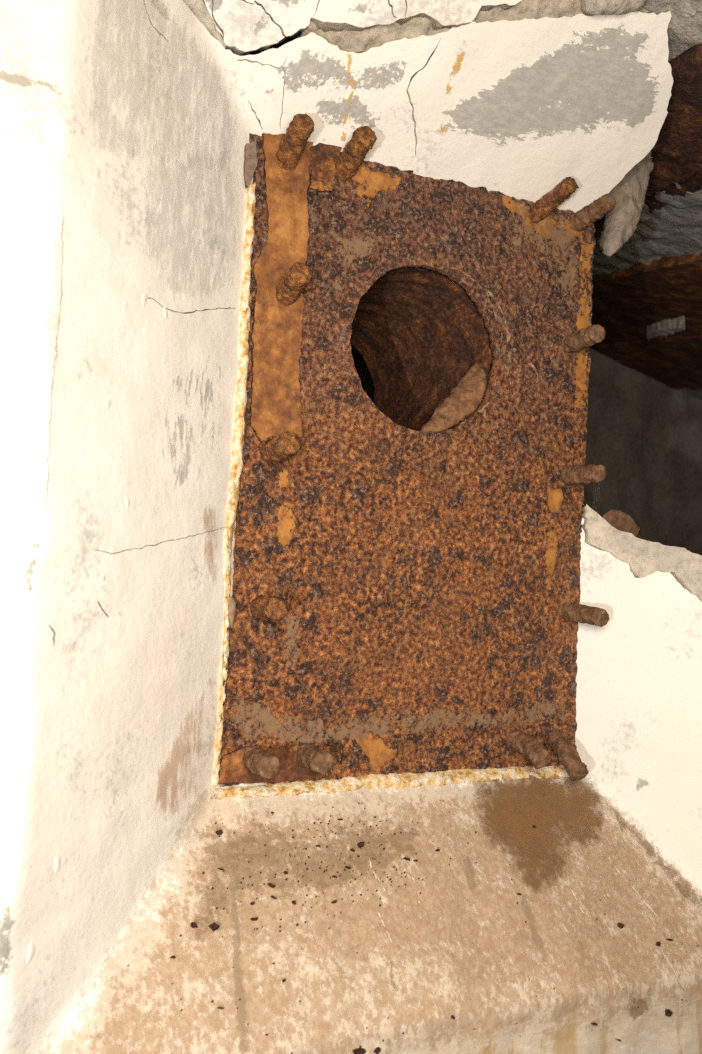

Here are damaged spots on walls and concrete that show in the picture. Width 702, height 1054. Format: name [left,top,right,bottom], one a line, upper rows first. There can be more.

crack [183,0,287,124]
peeling [265,2,450,129]
spalling [472,0,594,23]
peeling [440,23,660,146]
rust [502,195,595,331]
rust [420,361,499,433]
spalling [582,504,702,602]
rust [230,697,567,769]
damp [228,867,248,1053]
rust [43,711,702,1054]
damp [522,895,548,960]
damp [628,999,648,1019]